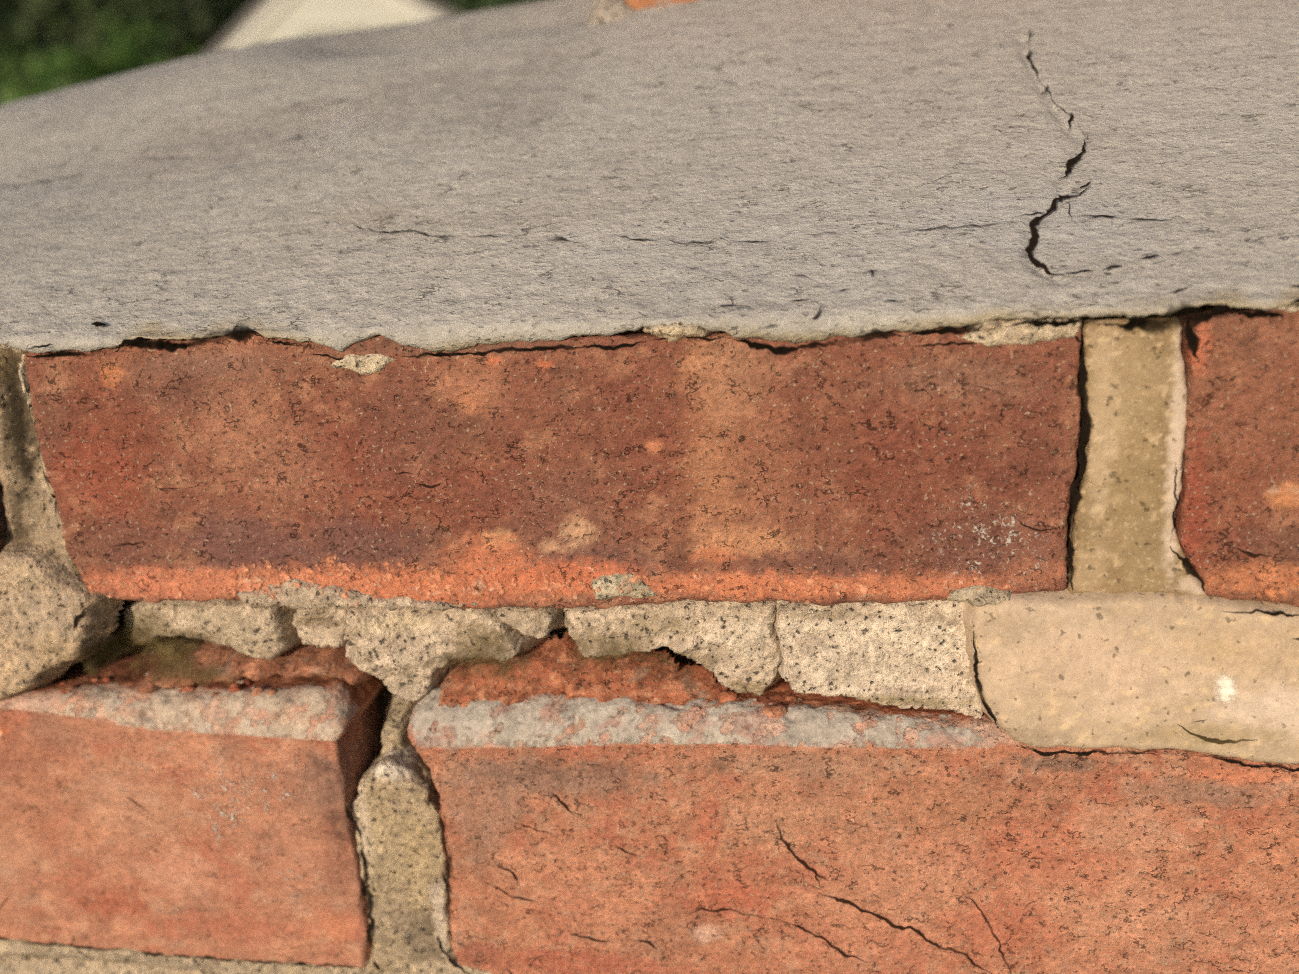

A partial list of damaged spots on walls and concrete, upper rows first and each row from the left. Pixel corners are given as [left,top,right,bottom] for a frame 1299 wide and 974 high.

crack [883,30,1157,276]
crack [354,225,451,237]
crack [549,234,768,244]
crack [398,336,828,358]
crack [862,299,1299,591]
spalling [123,599,983,755]
crack [973,632,1299,772]
crack [427,774,452,896]
crack [511,792,572,842]
crack [436,930,469,974]
crack [687,908,869,963]
crack [776,823,1011,974]